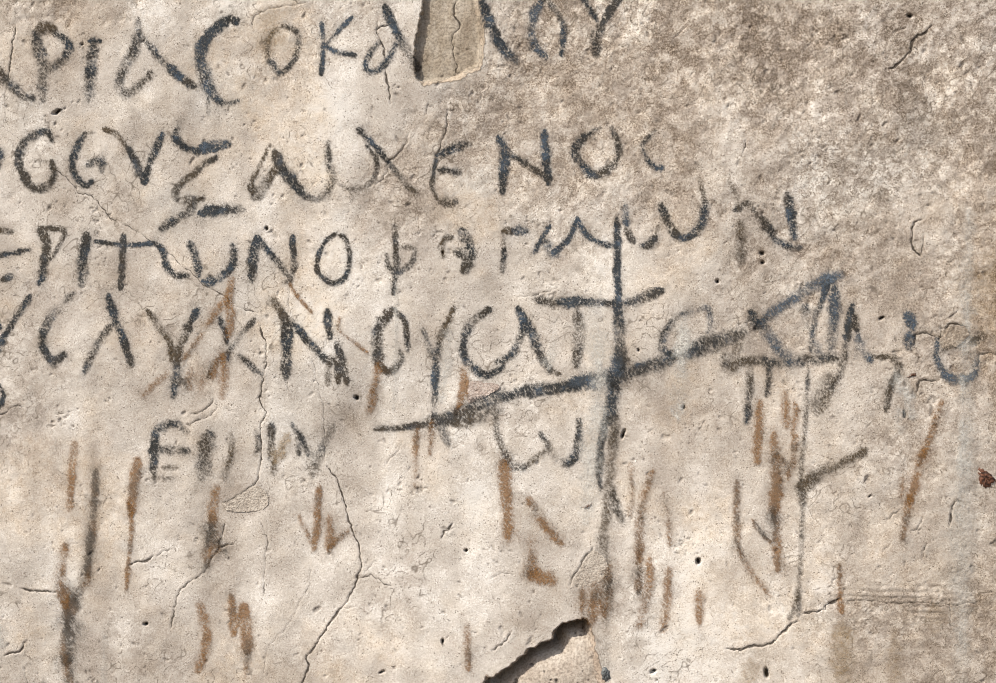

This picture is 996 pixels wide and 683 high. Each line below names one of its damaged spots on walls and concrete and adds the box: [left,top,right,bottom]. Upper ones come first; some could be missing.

flaking render [413,0,485,86]
crack [58,171,267,499]
crack [171,525,232,626]
crack [302,455,387,683]
flaking render [484,618,605,683]